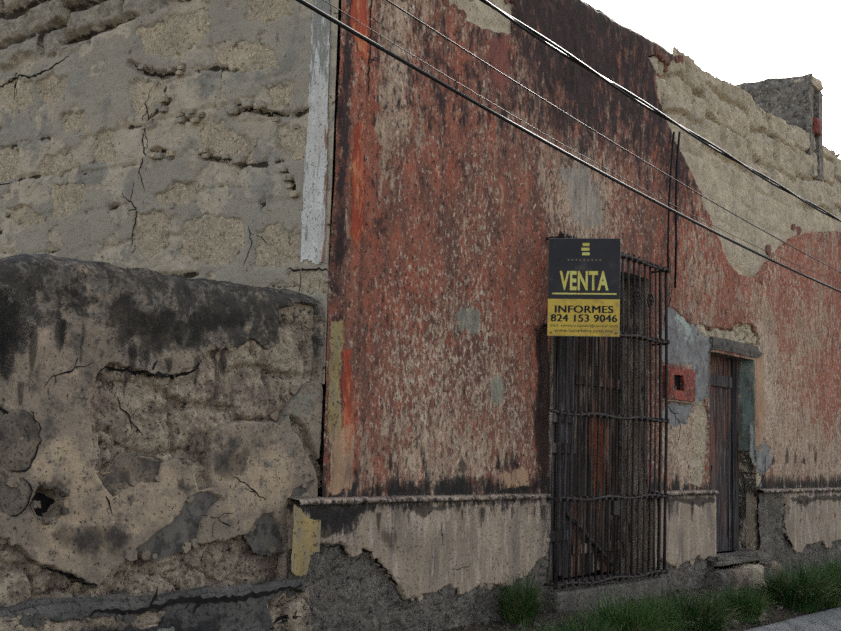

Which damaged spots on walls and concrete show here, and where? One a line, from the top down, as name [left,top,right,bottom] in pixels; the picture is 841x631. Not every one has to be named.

crack [0,56,68,98]
crack [123,91,155,246]
spalling [648,46,841,278]
spalling [255,223,333,298]
water stain [109,295,245,359]
crack [45,351,209,386]
crack [116,393,143,435]
spalling [0,303,550,631]
water stain [369,325,550,494]
spalling [689,400,707,487]
water stain [311,505,374,538]
water stain [409,503,451,517]